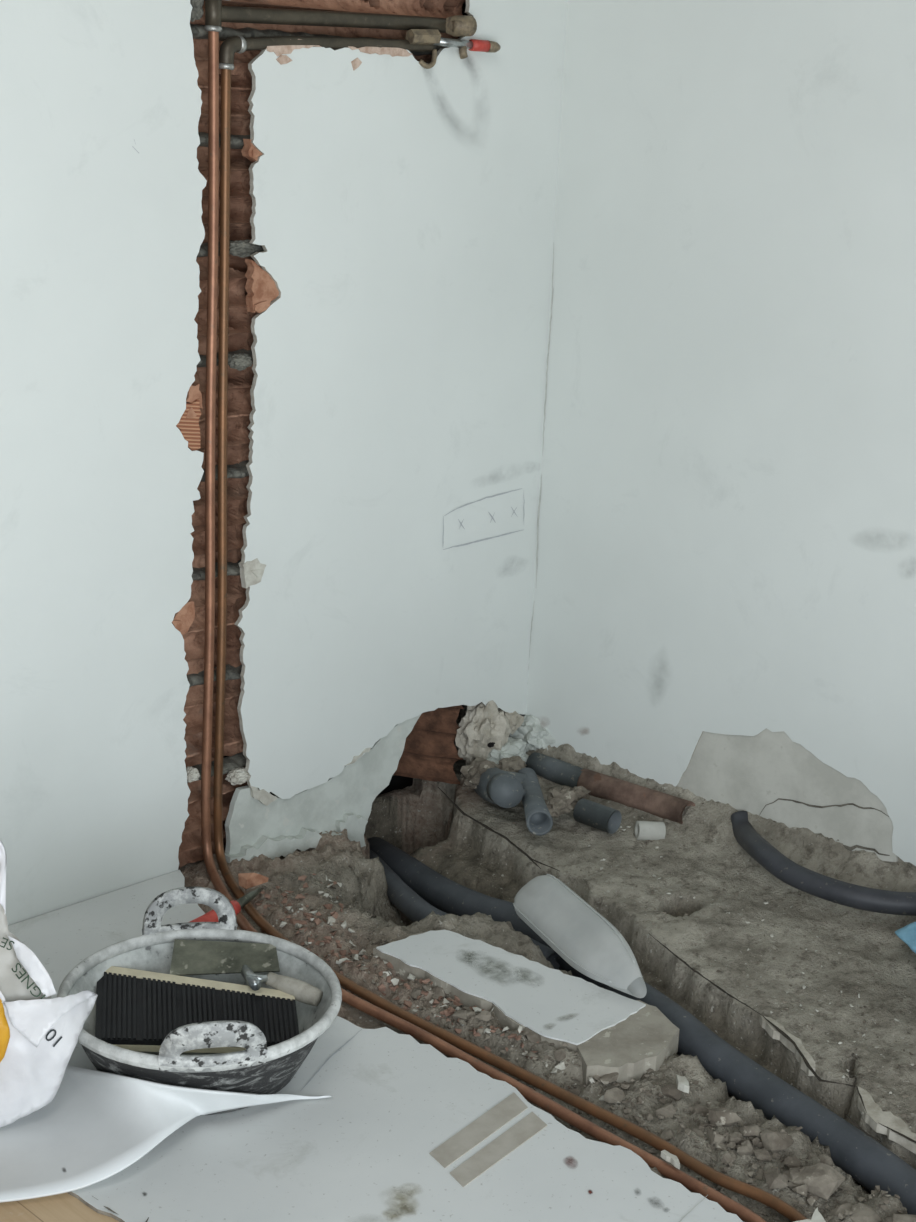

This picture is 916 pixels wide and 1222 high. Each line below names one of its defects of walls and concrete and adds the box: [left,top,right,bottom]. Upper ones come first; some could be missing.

spalling [267,39,321,65]
spalling [348,46,412,71]
spalling [241,139,262,162]
spalling [245,259,279,313]
spalling [176,382,203,451]
spalling [238,558,266,588]
spalling [172,600,195,635]
flaking render [225,700,555,863]
peeling [677,729,898,862]
flaking render [676,1075,689,1093]
flaking render [661,1150,680,1170]
flaking render [795,1207,826,1222]